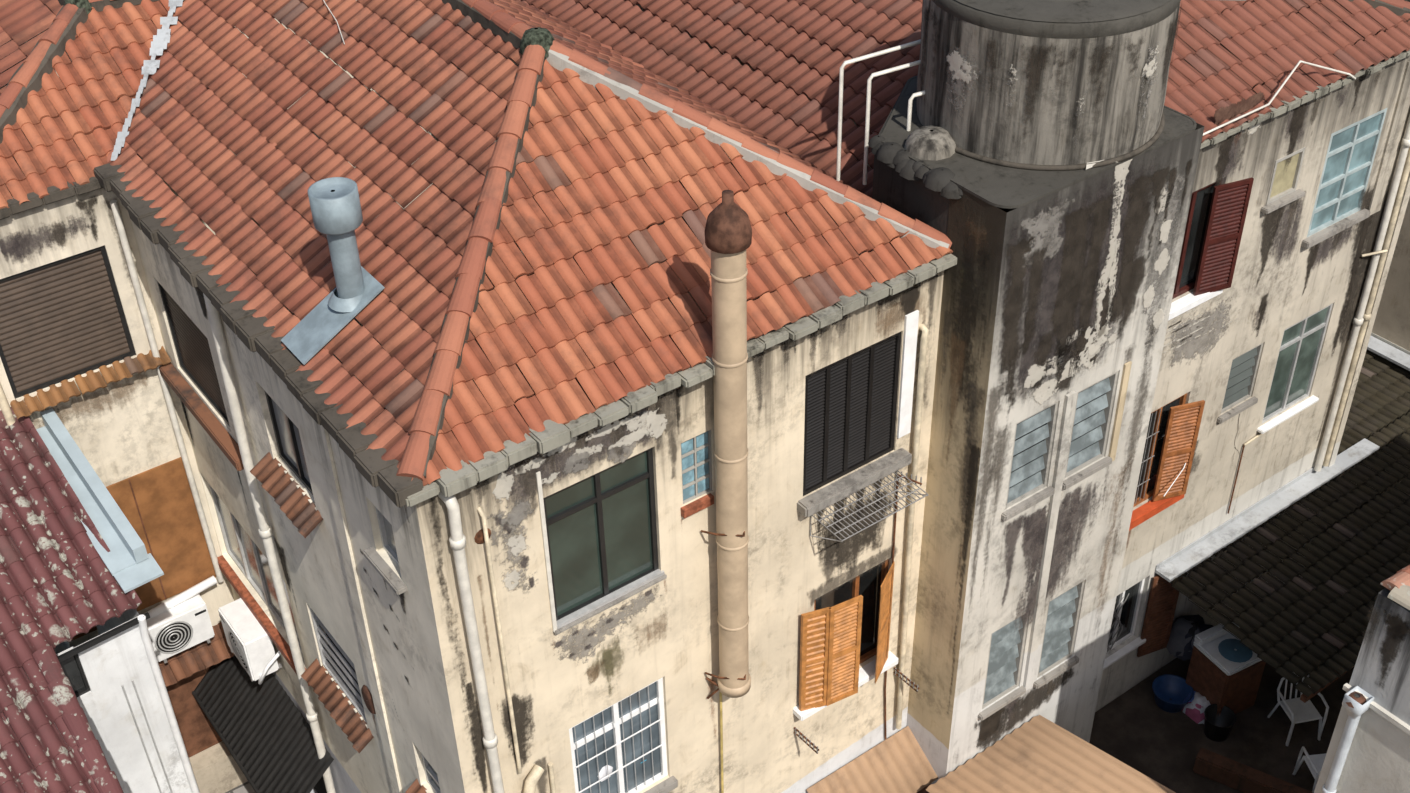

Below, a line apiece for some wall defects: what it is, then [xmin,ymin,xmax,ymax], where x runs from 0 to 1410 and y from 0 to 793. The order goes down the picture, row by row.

leakage [0,196,130,276]
leakage [878,159,1169,691]
peeling [488,408,667,591]
leakage [588,650,613,693]
leakage [1367,608,1410,685]